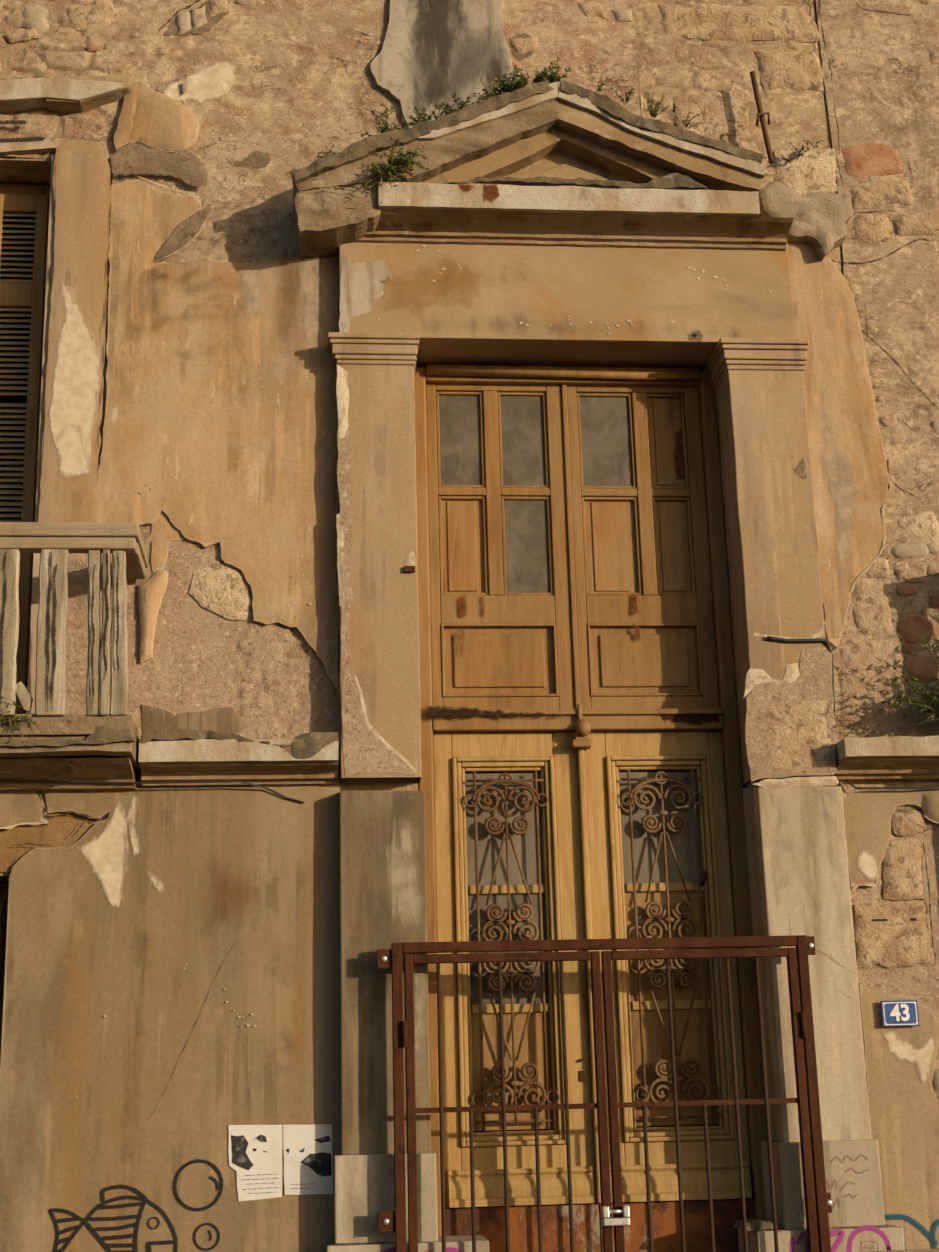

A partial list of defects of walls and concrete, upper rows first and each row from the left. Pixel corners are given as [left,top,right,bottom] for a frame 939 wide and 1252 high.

flaking render [0,0,408,333]
leakage [415,0,502,101]
crack [97,173,111,475]
flaking render [502,0,939,794]
flaking render [0,364,417,776]
flaking render [0,793,109,872]
flaking render [850,805,939,1022]